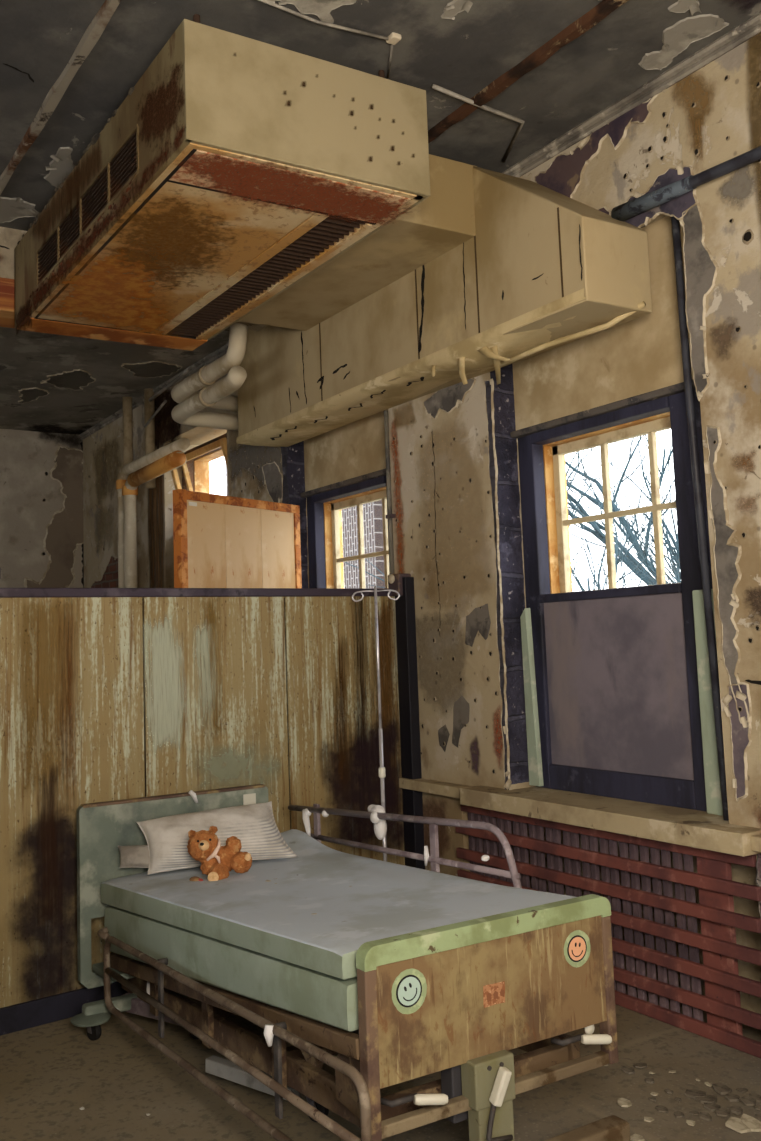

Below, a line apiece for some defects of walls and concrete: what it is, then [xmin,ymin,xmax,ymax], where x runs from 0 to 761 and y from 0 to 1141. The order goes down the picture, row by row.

peeling [267,0,357,24]
peeling [441,0,473,20]
peeling [639,0,729,70]
peeling [0,197,39,223]
rust [15,64,409,334]
spalling [535,88,719,401]
spalling [742,229,754,245]
peeling [24,446,90,588]
leakage [325,596,404,849]
spalling [410,378,512,790]
spalling [704,425,760,802]
leakage [15,771,78,1001]